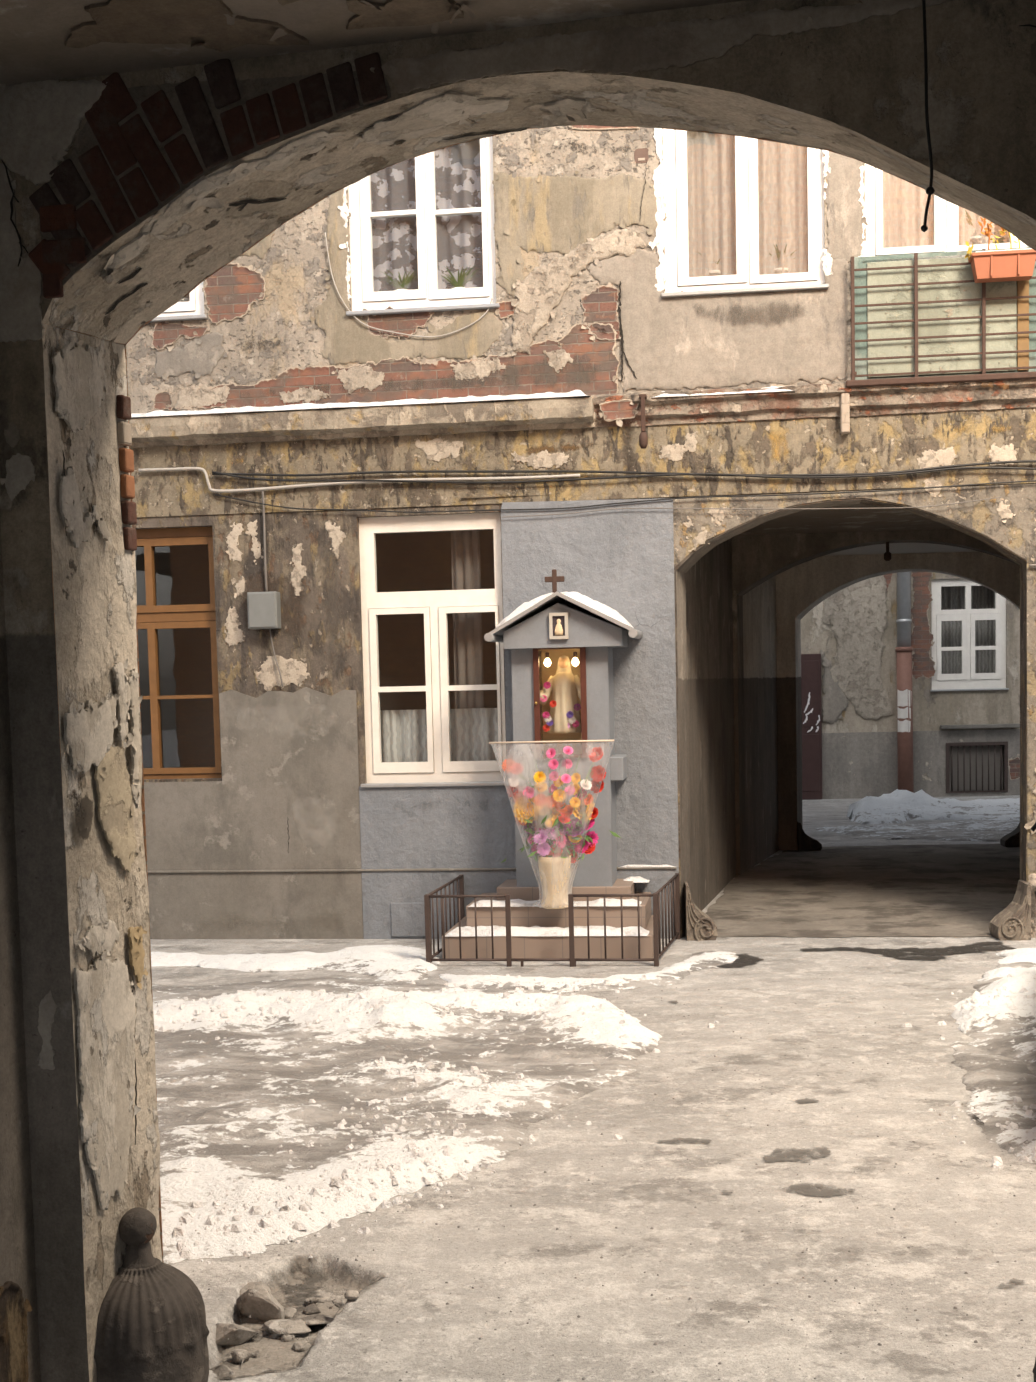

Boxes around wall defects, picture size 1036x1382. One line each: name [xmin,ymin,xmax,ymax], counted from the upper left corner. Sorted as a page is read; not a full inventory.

crack [2,161,28,267]
flaking render [0,0,953,342]
peeling [150,148,868,427]
peeling [52,340,137,551]
damp [526,444,590,454]
peeling [224,520,264,652]
damp [241,573,304,634]
peeling [290,543,306,596]
damp [323,531,341,666]
peeling [254,655,311,691]
peeling [64,659,143,872]
peeling [73,920,148,1211]